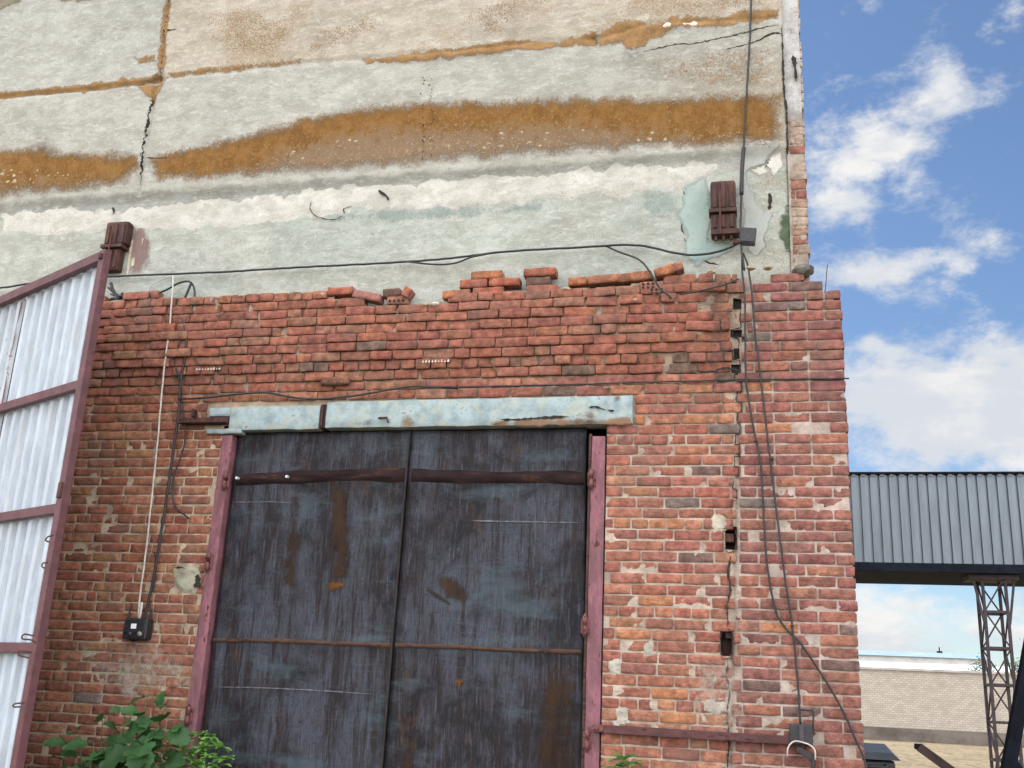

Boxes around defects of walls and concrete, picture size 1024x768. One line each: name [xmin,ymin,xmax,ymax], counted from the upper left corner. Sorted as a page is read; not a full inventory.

damp [363,9,779,64]
crack [140,0,176,184]
damp [0,94,782,197]
crack [646,25,798,196]
flaking render [742,140,783,256]
rust [495,413,631,426]
spalling [173,566,202,594]
rust [328,485,350,591]
rust [439,577,467,605]